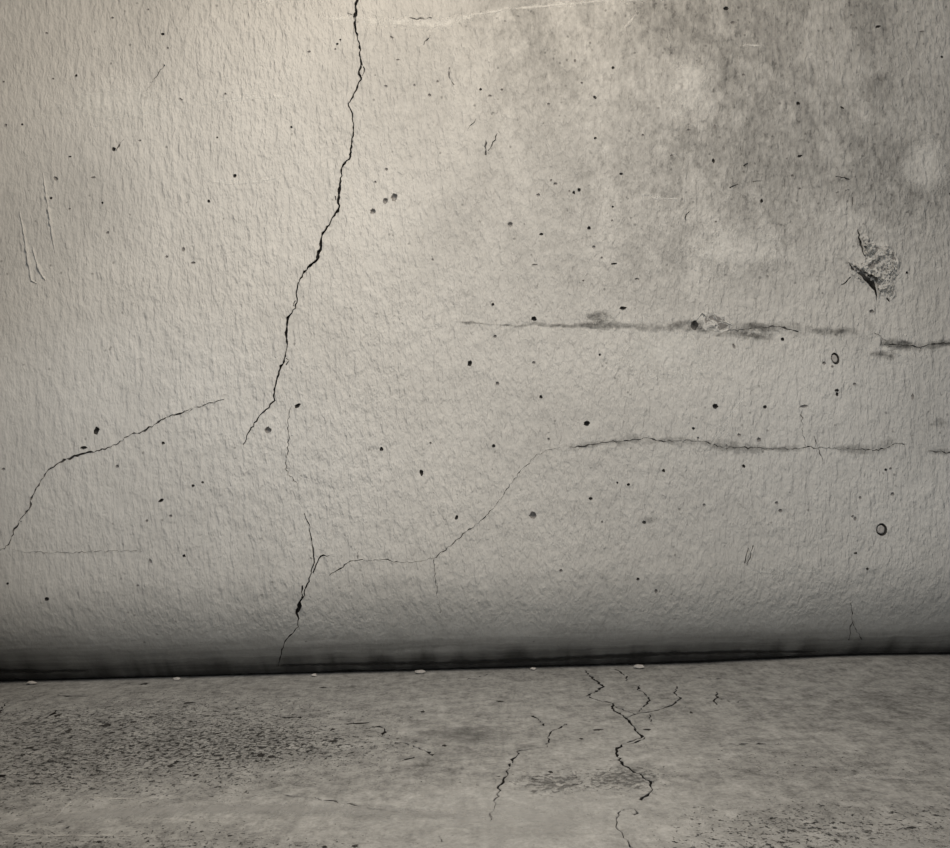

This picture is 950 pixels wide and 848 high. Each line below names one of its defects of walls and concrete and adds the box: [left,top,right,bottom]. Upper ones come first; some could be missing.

spalling [848,230,908,300]
crack [242,0,905,664]
crack [873,332,949,352]
crack [0,398,224,555]
crack [929,448,950,456]
crack [711,692,745,705]
crack [242,792,441,814]
crack [488,715,567,822]
crack [584,669,683,848]